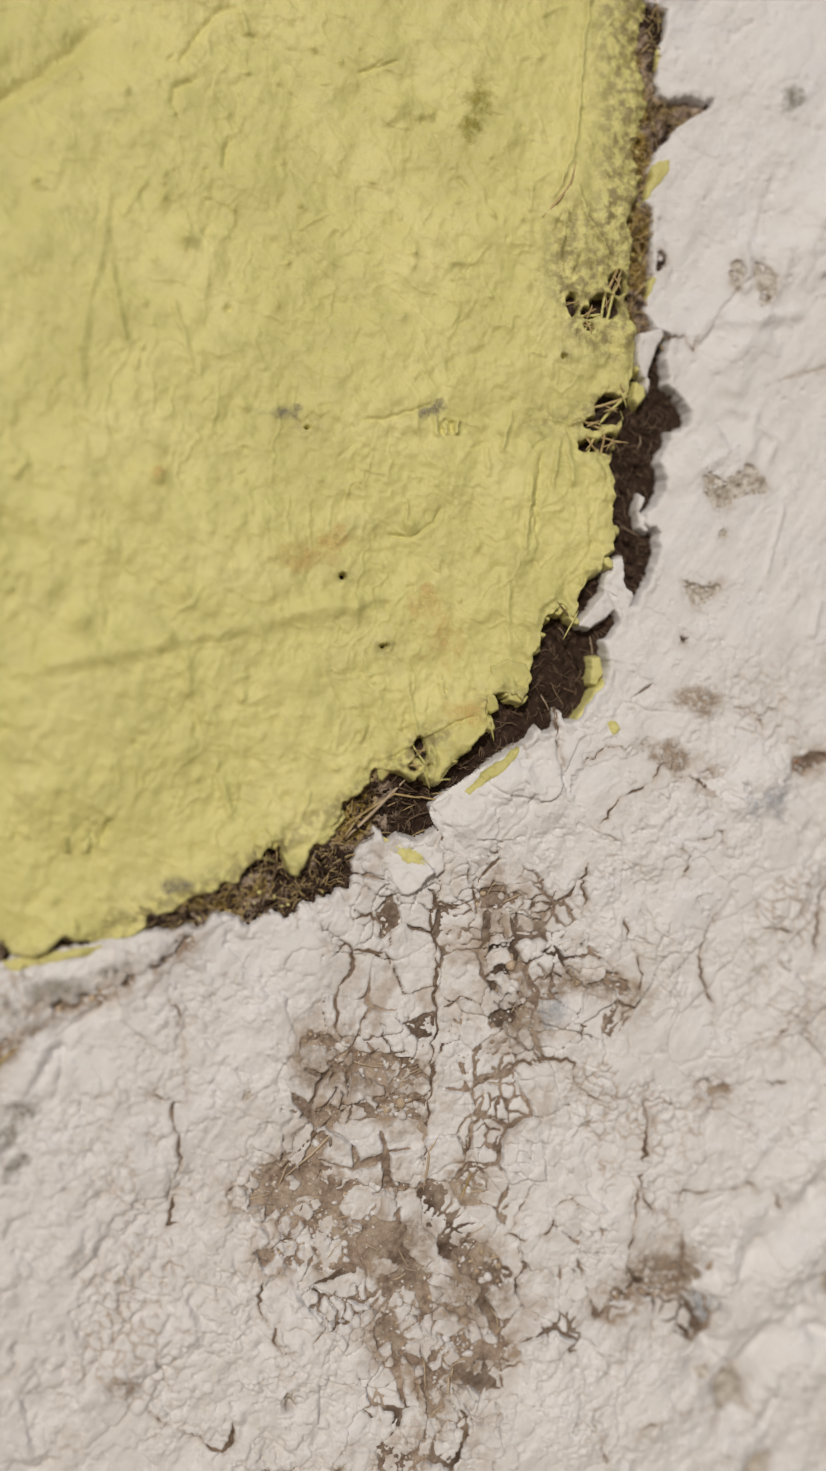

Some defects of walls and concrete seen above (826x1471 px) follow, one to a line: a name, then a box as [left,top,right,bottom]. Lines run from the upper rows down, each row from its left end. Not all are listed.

peeling [0,0,708,1055]
spalling [703,464,768,509]
crack [250,829,781,1471]